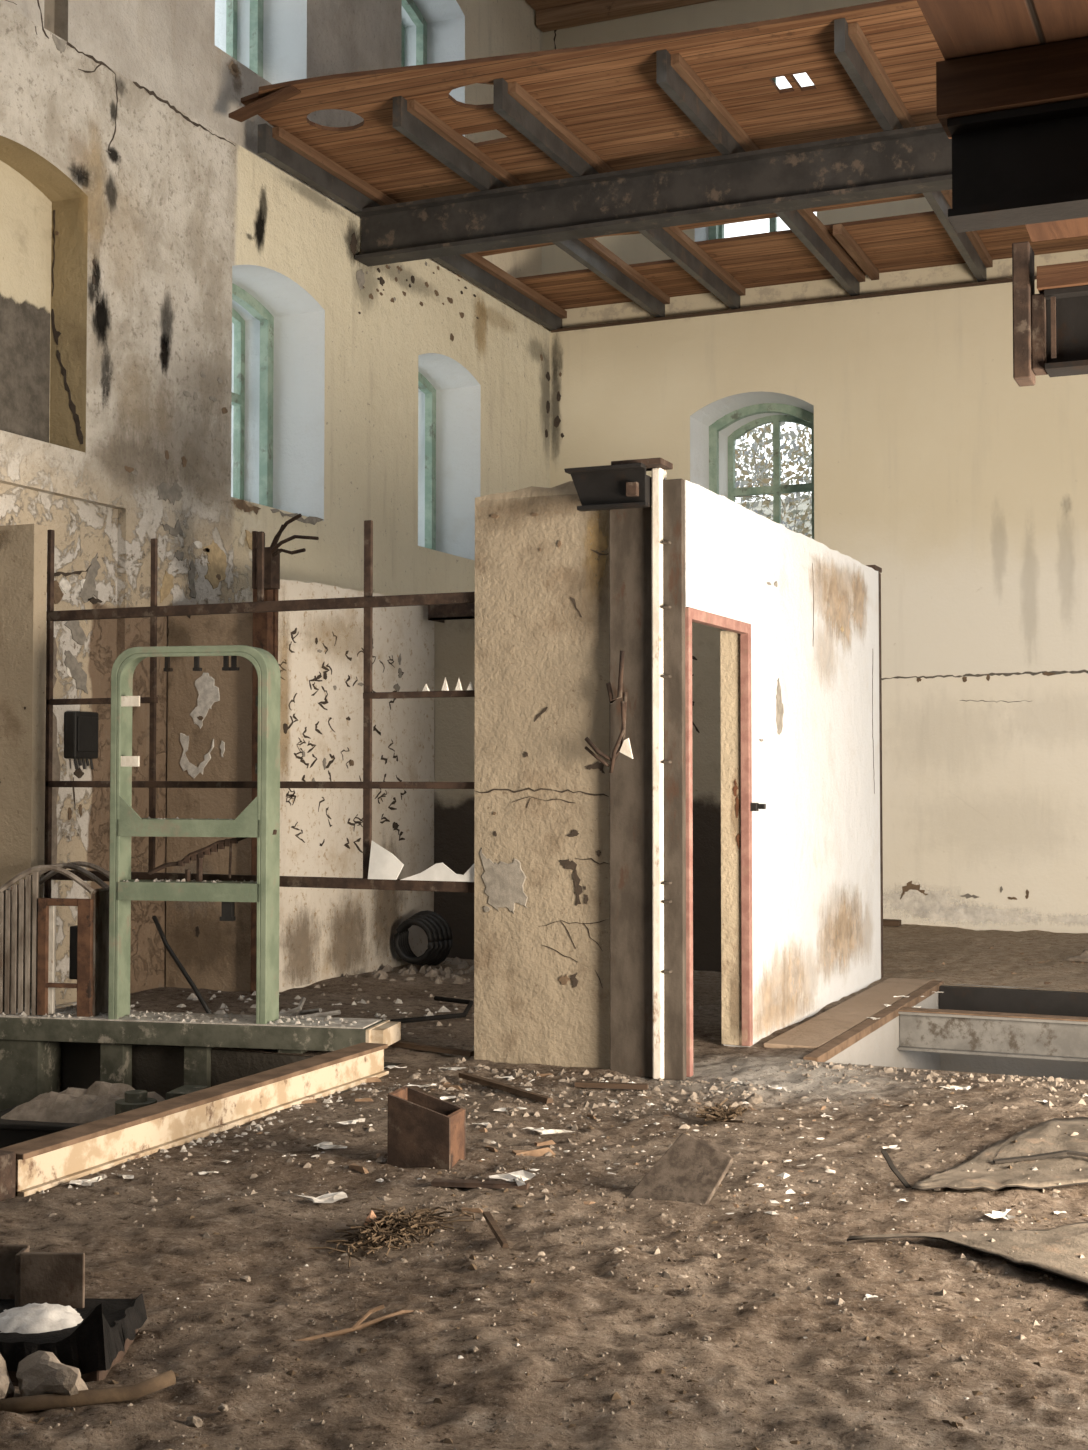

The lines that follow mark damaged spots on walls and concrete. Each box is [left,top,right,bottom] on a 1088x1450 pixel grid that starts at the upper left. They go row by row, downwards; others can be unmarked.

crack [5,0,235,151]
crack [51,210,83,445]
flaking render [350,232,479,319]
peeling [157,482,227,603]
crack [809,563,817,641]
peeling [180,673,225,778]
peeling [291,797,363,853]
peeling [283,631,404,806]
peeling [373,725,406,841]
crack [476,788,609,807]
crack [872,667,1088,794]
flaking render [900,881,928,900]